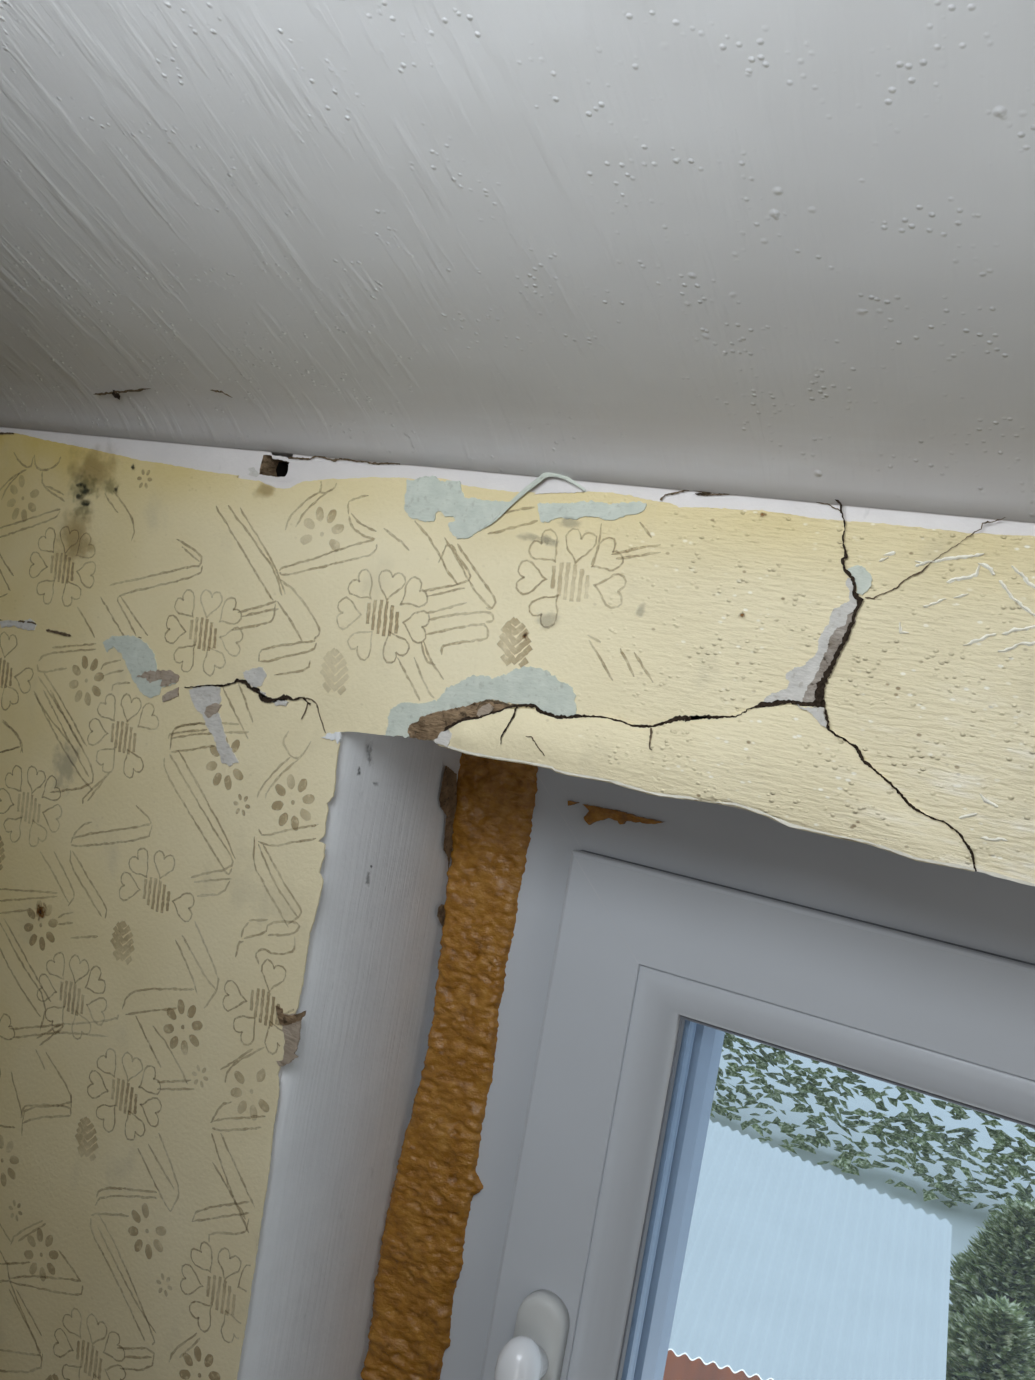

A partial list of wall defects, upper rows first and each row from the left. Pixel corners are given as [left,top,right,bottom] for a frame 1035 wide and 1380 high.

spalling [253,451,296,482]
peeling [404,473,647,539]
crack [0,619,71,637]
spalling [764,565,872,729]
spalling [103,635,239,766]
crack [184,678,326,733]
spalling [385,666,577,747]
crack [444,499,1006,872]
peeling [439,766,457,869]
peeling [437,904,445,926]
spalling [276,1005,306,1066]